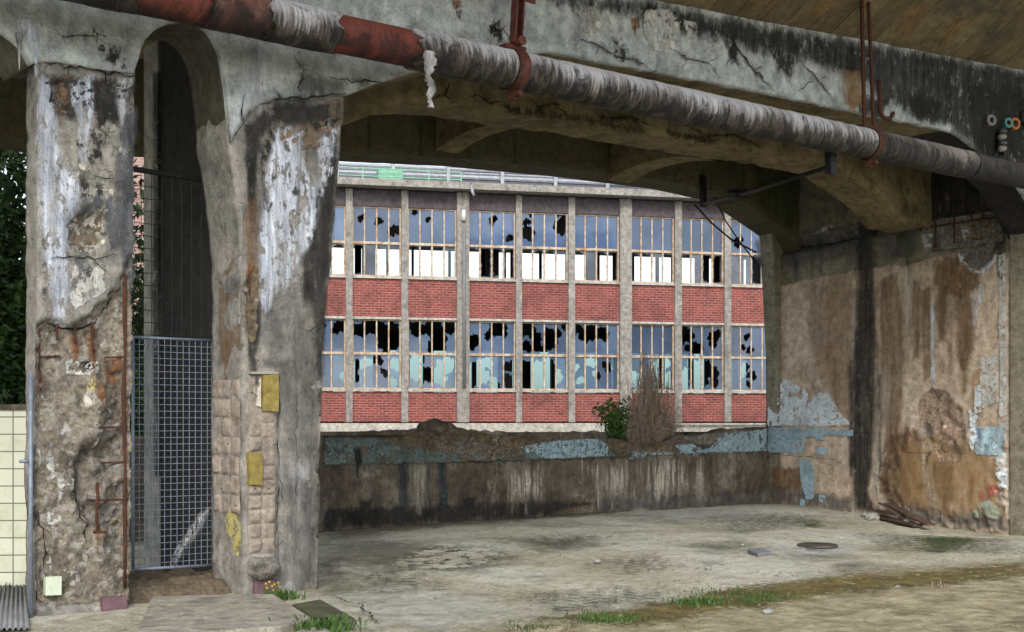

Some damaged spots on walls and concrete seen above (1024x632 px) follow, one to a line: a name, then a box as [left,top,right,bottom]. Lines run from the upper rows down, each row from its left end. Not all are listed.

corrosion [36,328,60,397]
water stain [19,18,136,346]
spalling [33,124,134,605]
corrosion [55,274,128,588]
water stain [219,49,341,386]
crack [235,52,381,135]
crack [434,83,504,104]
peeling [323,379,854,507]
water stain [323,168,1005,591]
water stain [553,0,1024,164]
spalling [918,211,1008,519]